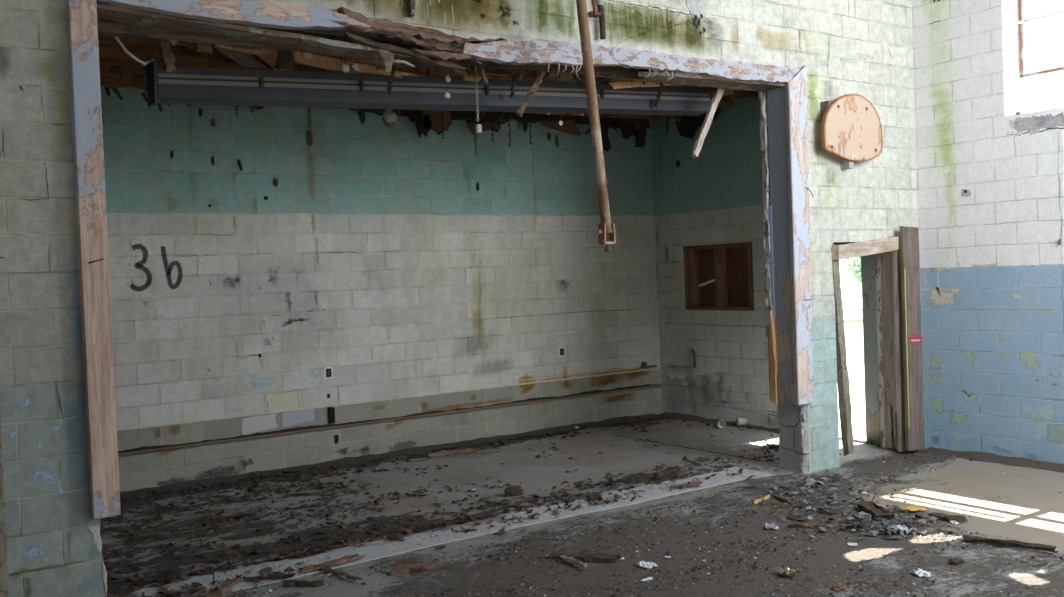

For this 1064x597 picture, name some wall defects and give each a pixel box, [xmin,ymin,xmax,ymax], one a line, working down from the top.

leakage [476,0,547,31]
peeling [924,267,962,307]
peeling [925,331,978,424]
crack [770,408,802,454]